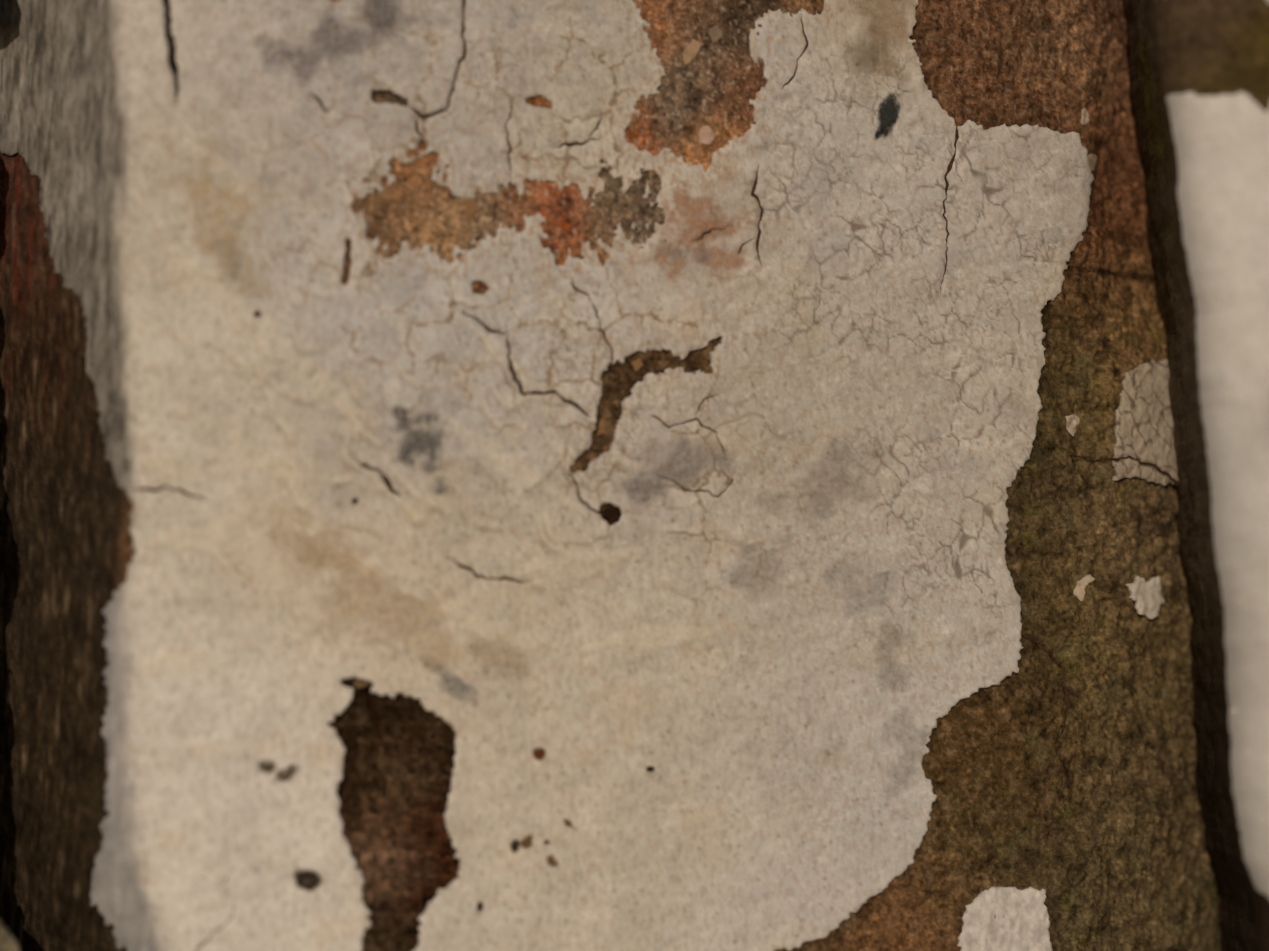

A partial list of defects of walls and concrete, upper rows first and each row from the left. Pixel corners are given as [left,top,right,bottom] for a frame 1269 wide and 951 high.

crack [163,0,179,103]
crack [409,0,466,144]
peeling [625,0,824,172]
crack [782,13,808,88]
peeling [351,140,667,267]
crack [695,162,764,268]
crack [939,124,959,297]
crack [456,307,592,418]
spalling [599,503,622,526]
spalling [568,337,721,476]
peeling [776,0,1220,951]
peeling [328,678,460,951]